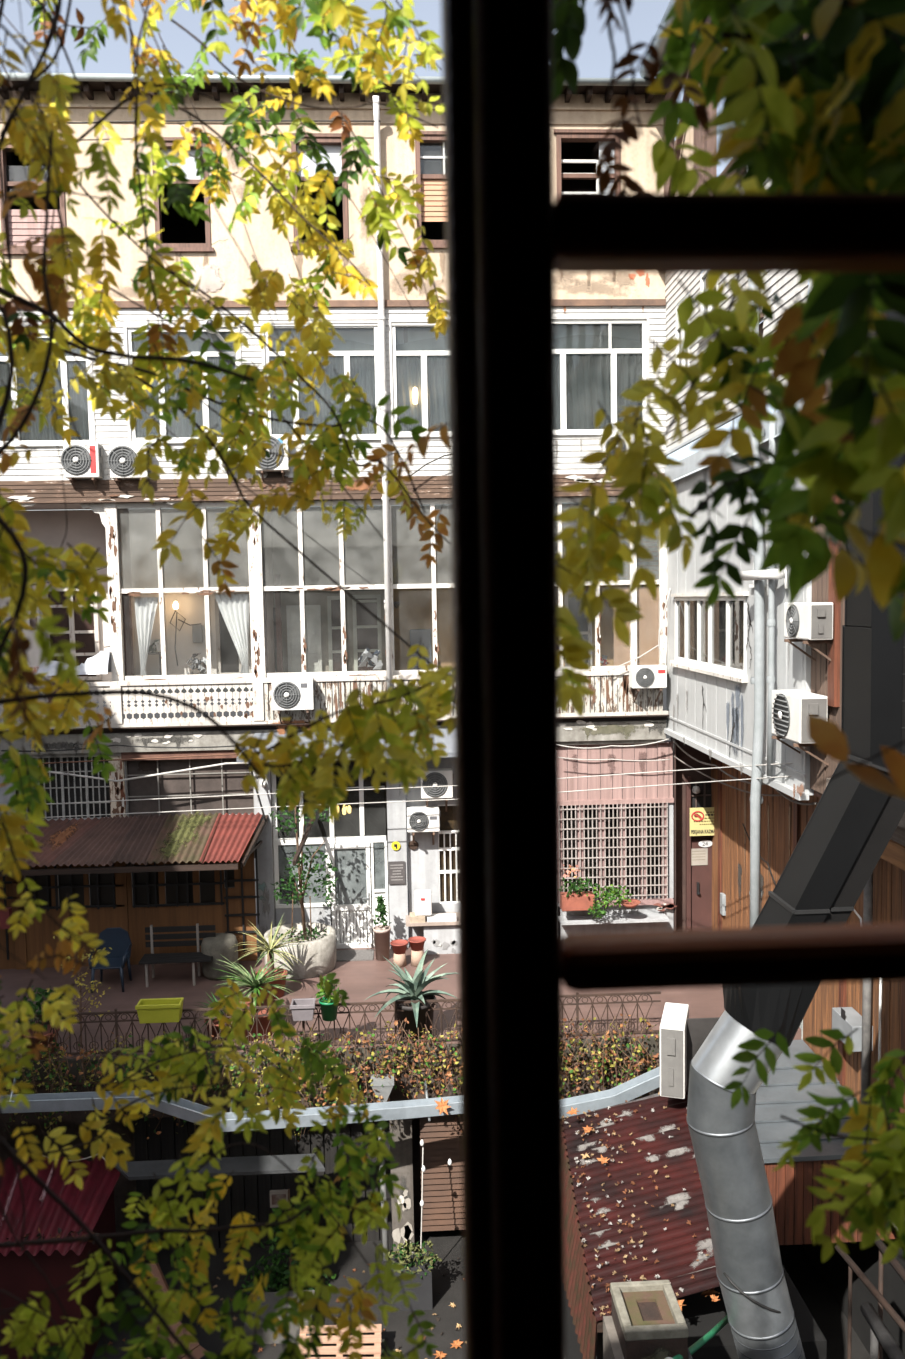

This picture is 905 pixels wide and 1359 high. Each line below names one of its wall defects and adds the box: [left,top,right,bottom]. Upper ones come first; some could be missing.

peeling [108,525,117,557]
peeling [587,667,629,712]
spalling [559,720,597,731]